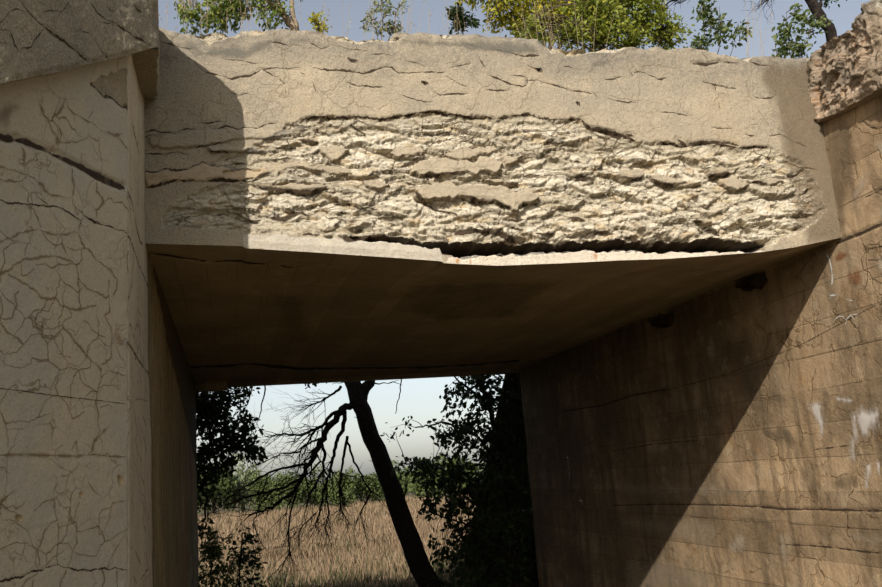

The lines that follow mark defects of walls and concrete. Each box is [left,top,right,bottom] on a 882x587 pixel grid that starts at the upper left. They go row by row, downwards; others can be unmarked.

crack [660,61,817,170]
spalling [144,109,828,266]
crack [621,176,673,188]
crack [695,171,730,192]
crack [693,219,720,236]
crack [0,0,665,587]
crack [564,223,882,412]
water stain [813,404,823,430]
water stain [854,411,878,433]
crack [613,504,882,512]
crack [780,544,879,554]